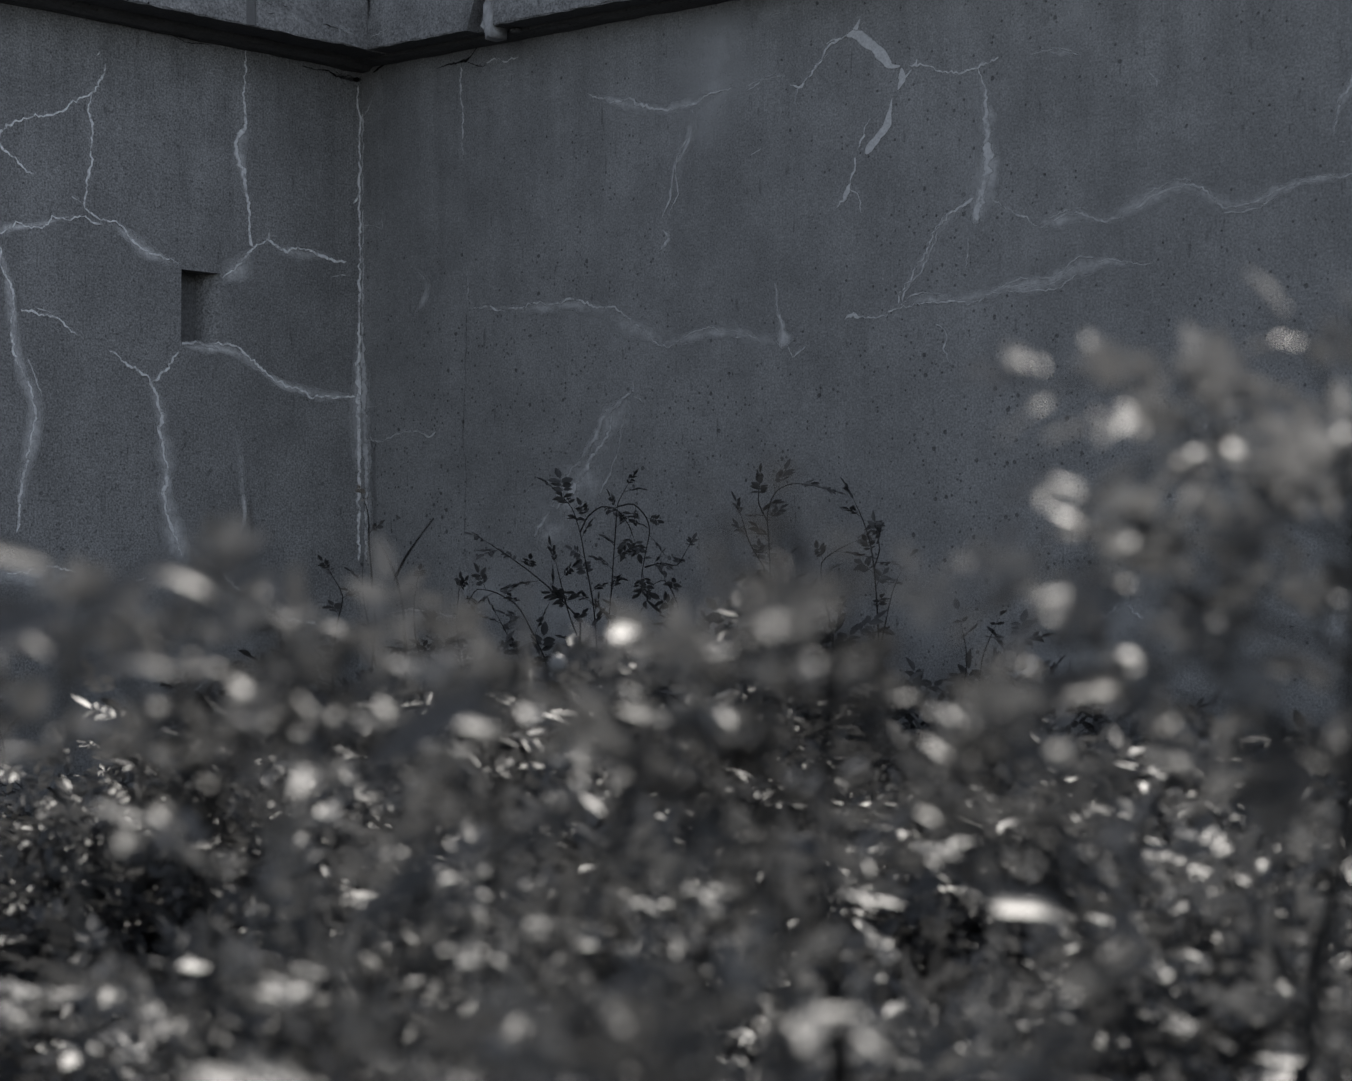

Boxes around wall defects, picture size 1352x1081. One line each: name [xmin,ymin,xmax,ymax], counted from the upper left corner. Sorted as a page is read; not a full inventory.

crack [0,64,174,533]
crack [223,50,346,281]
crack [303,0,387,82]
crack [439,48,533,68]
crack [466,270,805,358]
crack [587,74,778,250]
spalling [790,19,912,213]
crack [844,57,1352,364]
crack [108,341,356,586]
crack [0,566,67,586]